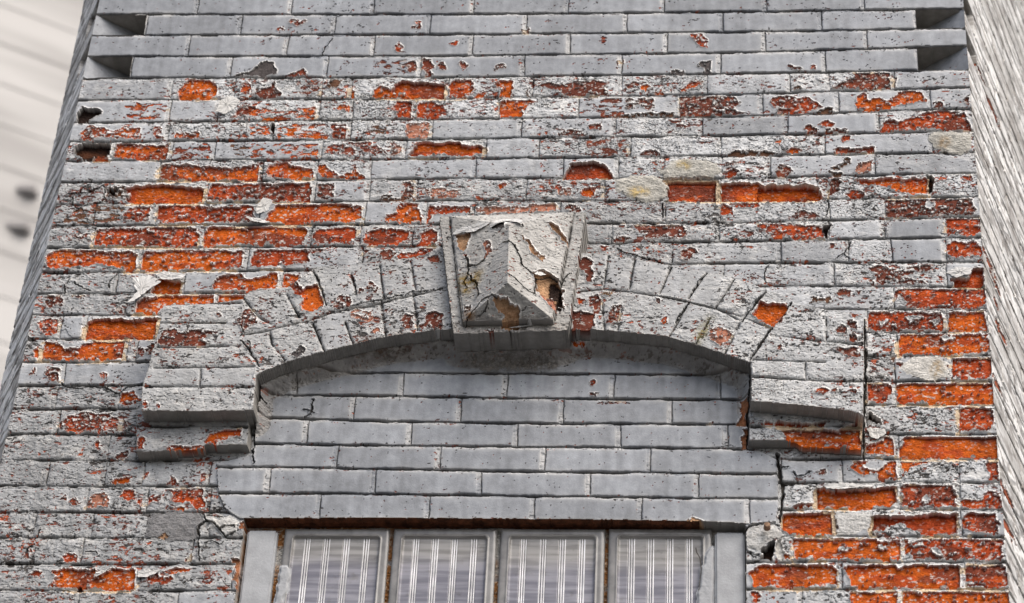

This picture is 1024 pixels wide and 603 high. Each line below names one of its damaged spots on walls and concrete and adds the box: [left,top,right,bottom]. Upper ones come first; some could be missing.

peeling [831,69,972,133]
peeling [29,33,748,383]
crack [314,240,572,327]
crack [660,275,711,324]
crack [743,264,770,322]
peeling [663,85,1017,603]
crack [861,319,869,460]
peeling [58,390,160,461]
peeling [167,427,243,459]
peeling [60,471,208,512]
crack [745,452,813,558]
peeling [28,553,194,595]